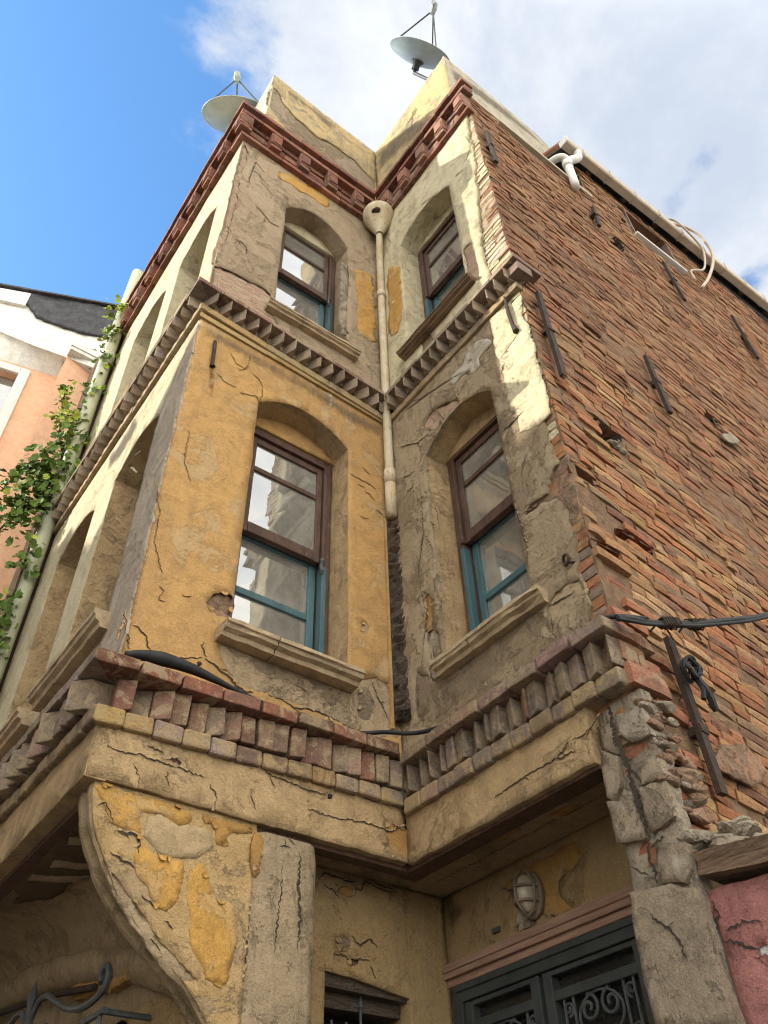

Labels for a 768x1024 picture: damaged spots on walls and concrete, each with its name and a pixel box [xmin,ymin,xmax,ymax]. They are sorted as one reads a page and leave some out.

peeling [338,262,403,342]
peeling [449,295,551,433]
spalling [206,591,235,618]
crack [108,745,218,811]
crack [251,770,406,832]
crack [430,700,664,886]
spalling [633,698,715,825]
peeling [13,823,90,904]
peeling [93,782,265,988]
crack [274,839,398,951]
crack [649,913,687,958]
crack [711,901,761,951]